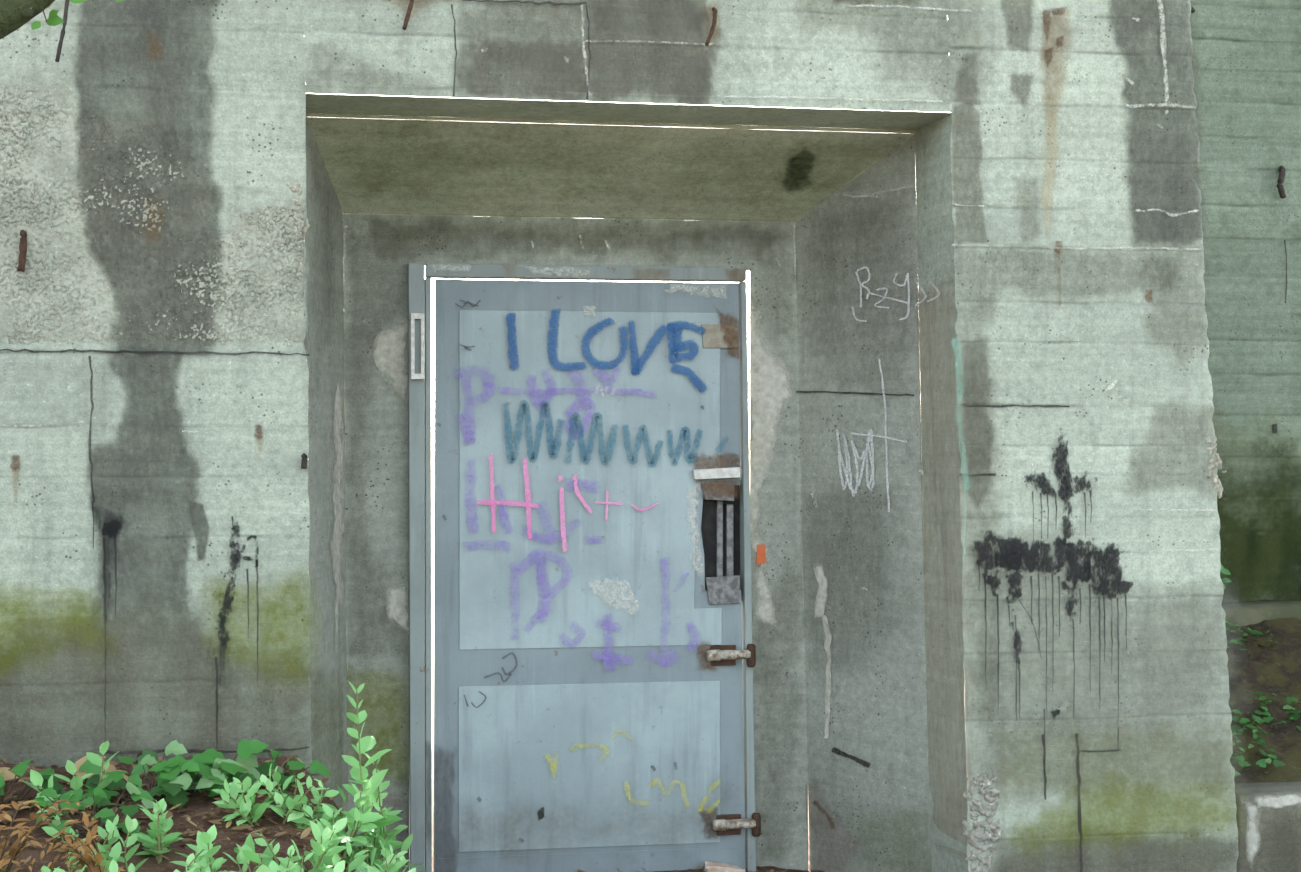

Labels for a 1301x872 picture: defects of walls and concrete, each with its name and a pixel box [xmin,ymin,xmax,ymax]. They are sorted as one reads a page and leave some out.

leakage [456,0,715,106]
corrosion [1043,8,1065,65]
leakage [1102,0,1204,250]
leakage [0,0,308,768]
leakage [977,491,1232,795]
spalling [962,772,1003,872]
crack [1042,728,1121,872]